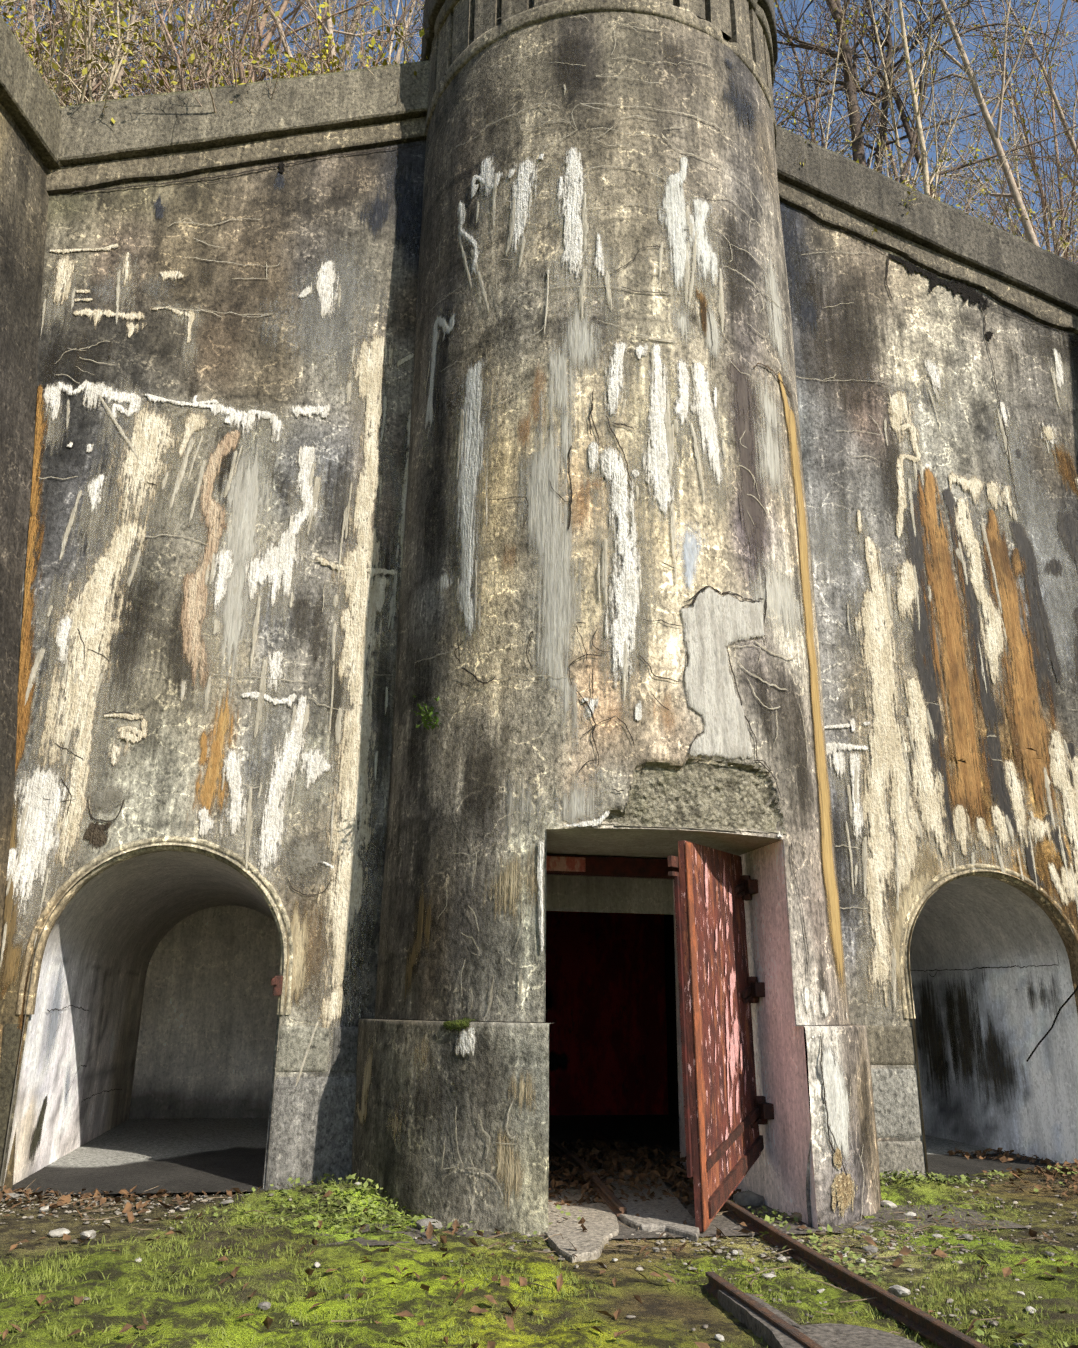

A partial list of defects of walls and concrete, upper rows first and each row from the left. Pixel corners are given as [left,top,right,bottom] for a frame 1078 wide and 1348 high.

rust [15,385,48,772]
rust [193,686,234,810]
crack [488,389,633,529]
crack [373,568,808,797]
spalling [599,586,786,834]
rust [778,373,844,985]
rust [916,467,1078,939]
rust [1054,444,1078,494]
damp [915,969,1026,1103]